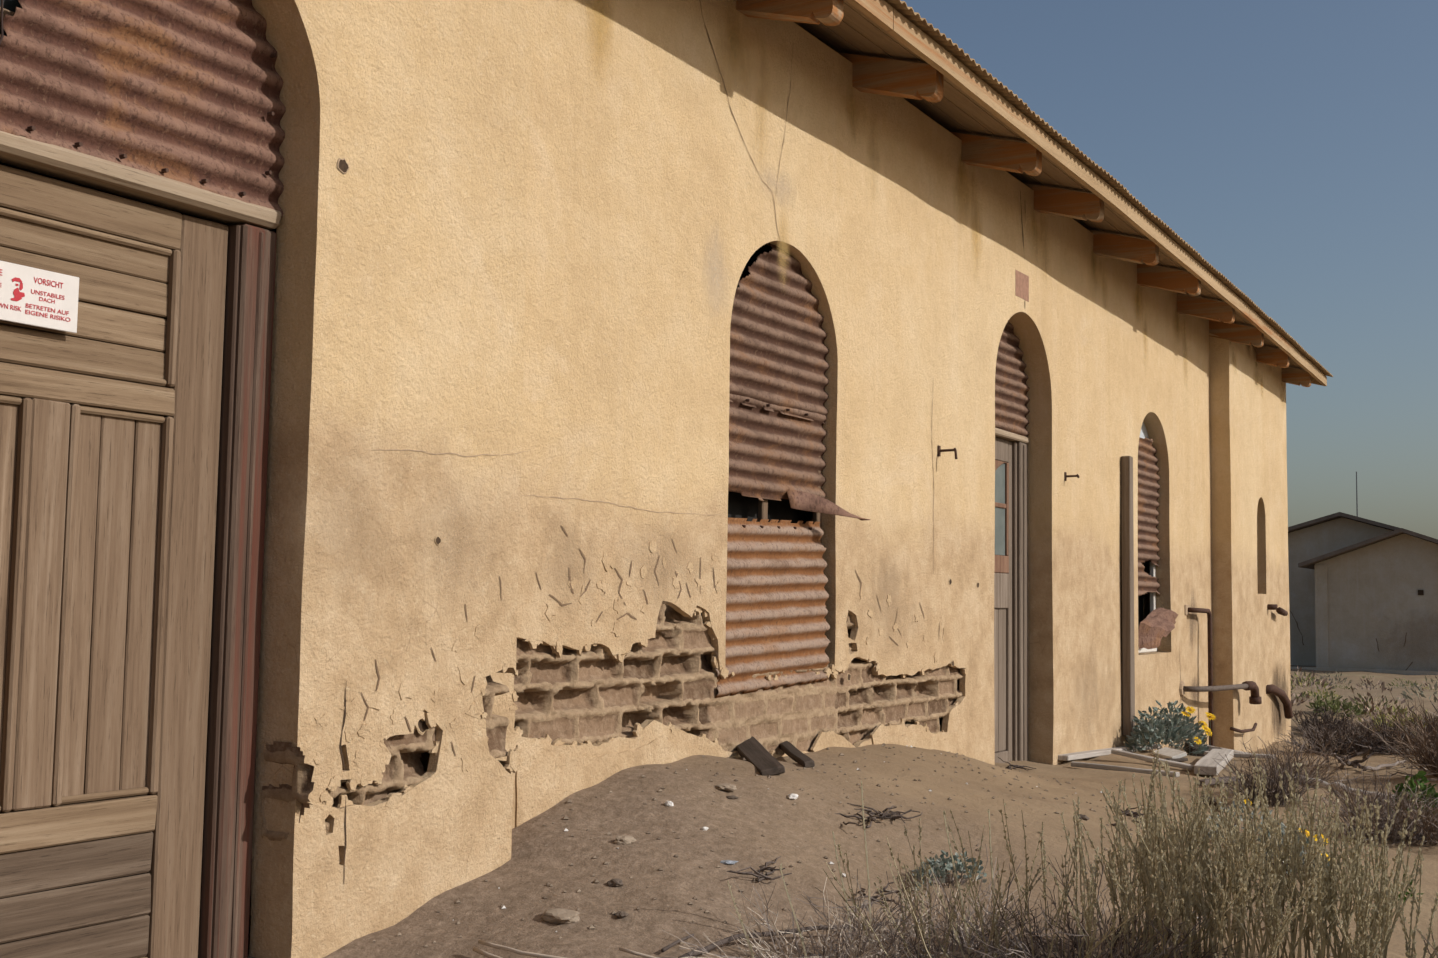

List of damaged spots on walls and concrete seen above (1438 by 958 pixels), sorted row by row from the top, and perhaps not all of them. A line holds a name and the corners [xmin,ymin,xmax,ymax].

crack [700,2,793,238]
spalling [260,541,966,841]